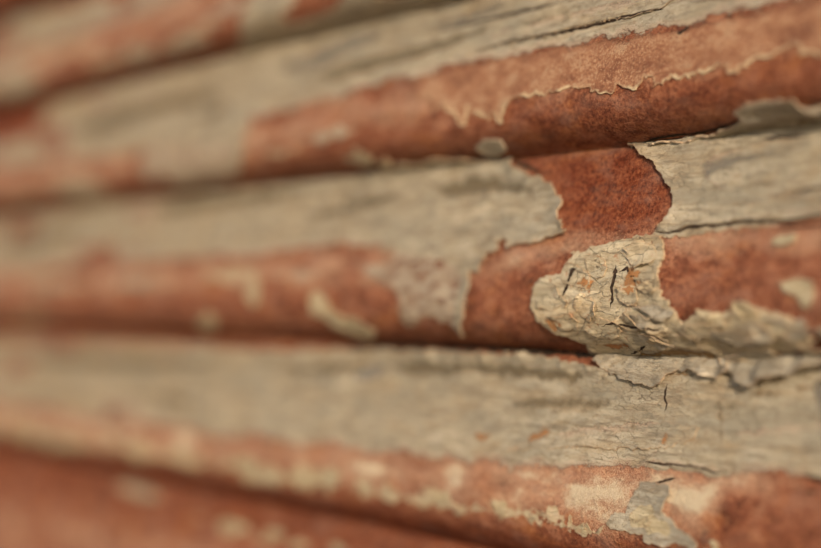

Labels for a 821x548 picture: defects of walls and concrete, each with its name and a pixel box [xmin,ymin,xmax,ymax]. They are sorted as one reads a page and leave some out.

crack [645,120,738,142]
peeling [0,0,821,337]
crack [655,183,821,234]
corrosion [622,267,640,294]
peeling [0,289,821,548]
crack [645,461,730,483]